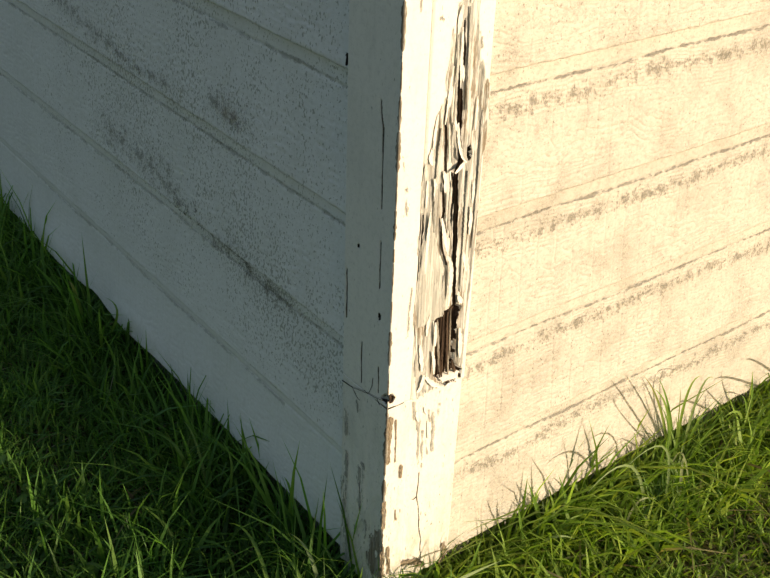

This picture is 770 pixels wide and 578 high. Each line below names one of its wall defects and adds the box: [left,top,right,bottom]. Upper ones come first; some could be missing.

spalling [391,62,410,320]
peeling [407,0,491,467]
peeling [378,377,403,578]
crack [412,473,421,560]